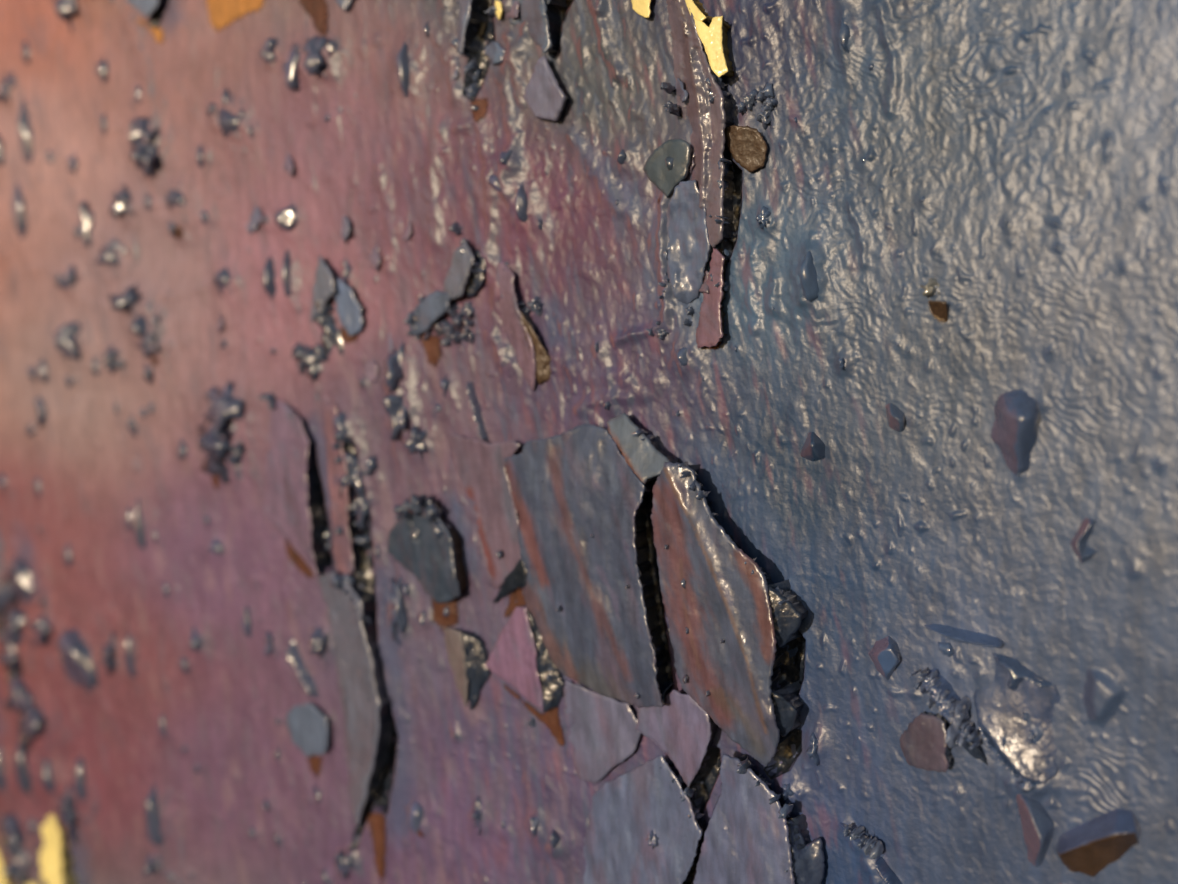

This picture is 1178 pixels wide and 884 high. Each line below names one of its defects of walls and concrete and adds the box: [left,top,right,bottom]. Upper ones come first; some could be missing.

peeling [449,0,569,121]
peeling [643,0,778,348]
crack [721,151,742,267]
peeling [29,815,77,884]
crack [316,436,377,627]
crack [347,704,398,852]
rust [504,588,526,617]
rust [504,685,564,746]
peeling [443,412,825,884]
crack [645,479,673,682]
crack [683,746,721,884]
peeling [974,656,1060,784]